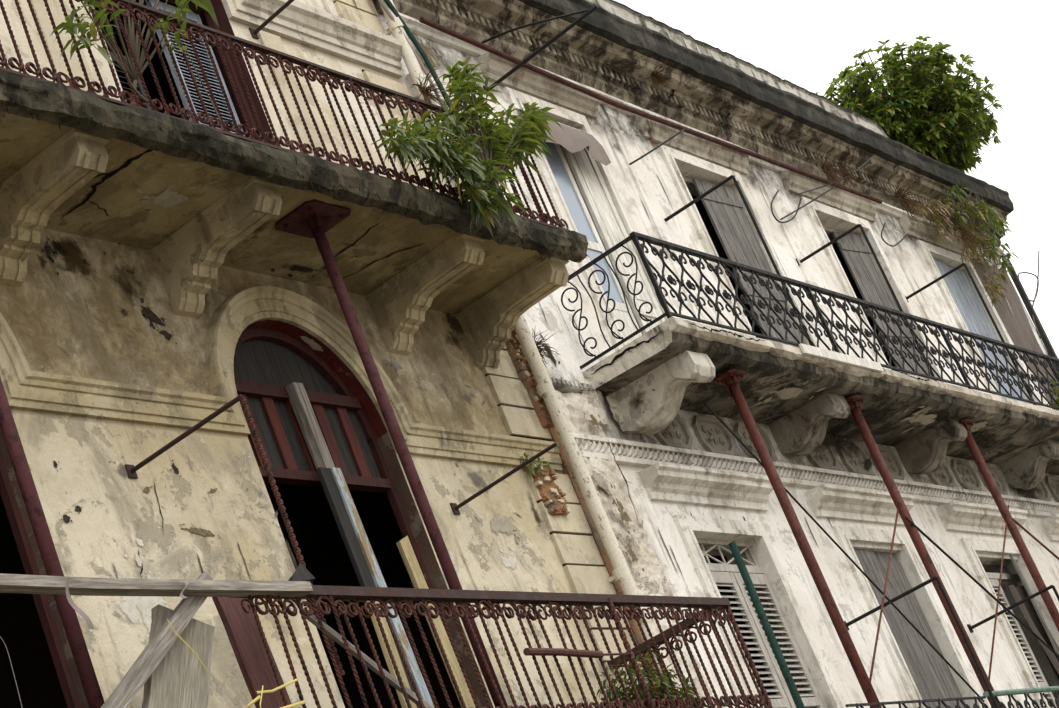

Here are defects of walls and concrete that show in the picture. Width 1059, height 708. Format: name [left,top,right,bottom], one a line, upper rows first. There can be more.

crack [61,150,153,219]
water stain [39,236,92,275]
crack [334,222,423,278]
flaking render [505,329,554,428]
peeling [755,381,825,406]
peeling [896,406,937,433]
peeling [971,415,994,433]
flaking render [524,464,570,516]
spalling [608,485,645,571]